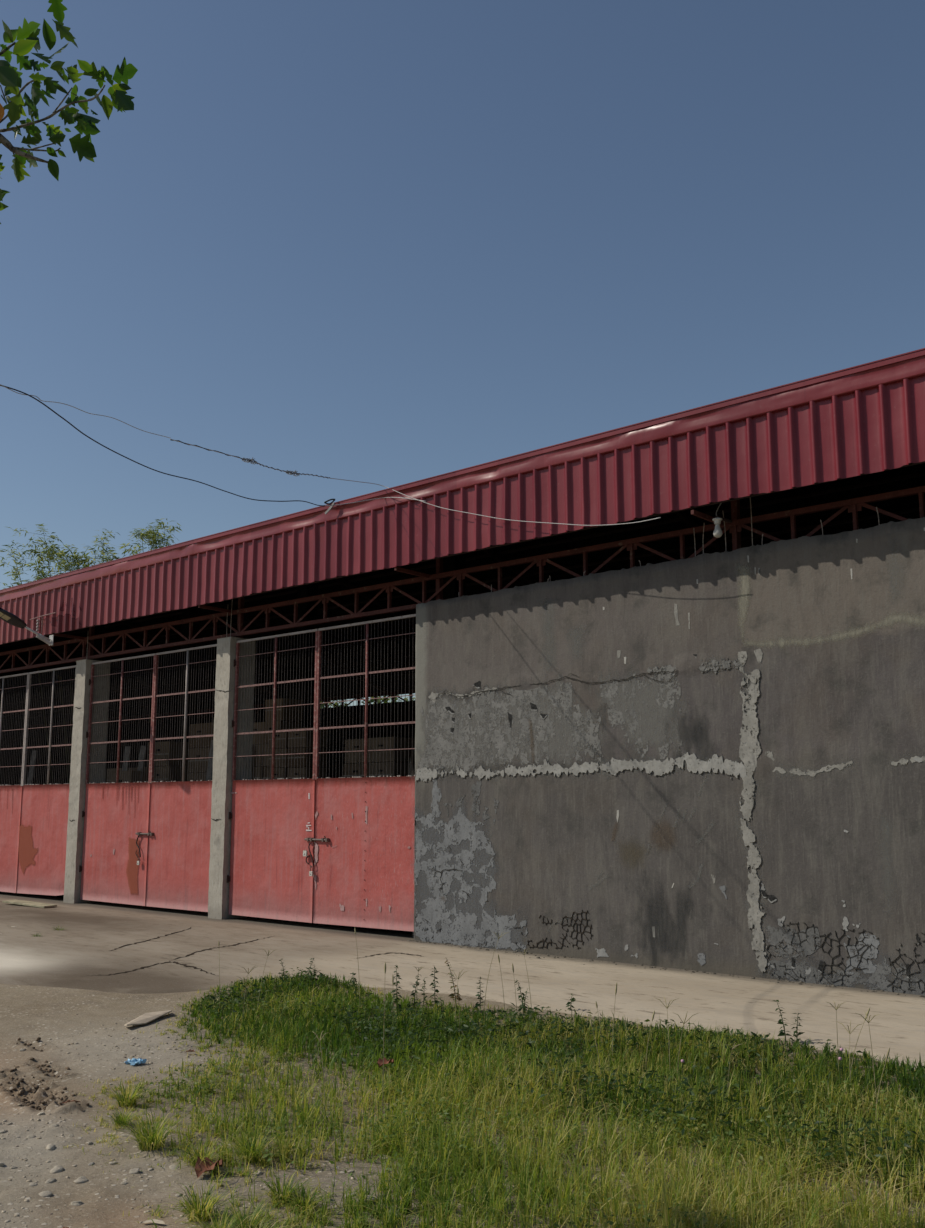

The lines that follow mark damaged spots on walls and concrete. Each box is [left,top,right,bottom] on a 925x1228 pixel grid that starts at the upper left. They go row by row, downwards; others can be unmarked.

rust [18,825,38,874]
rust [126,838,139,894]
peeling [414,649,925,996]